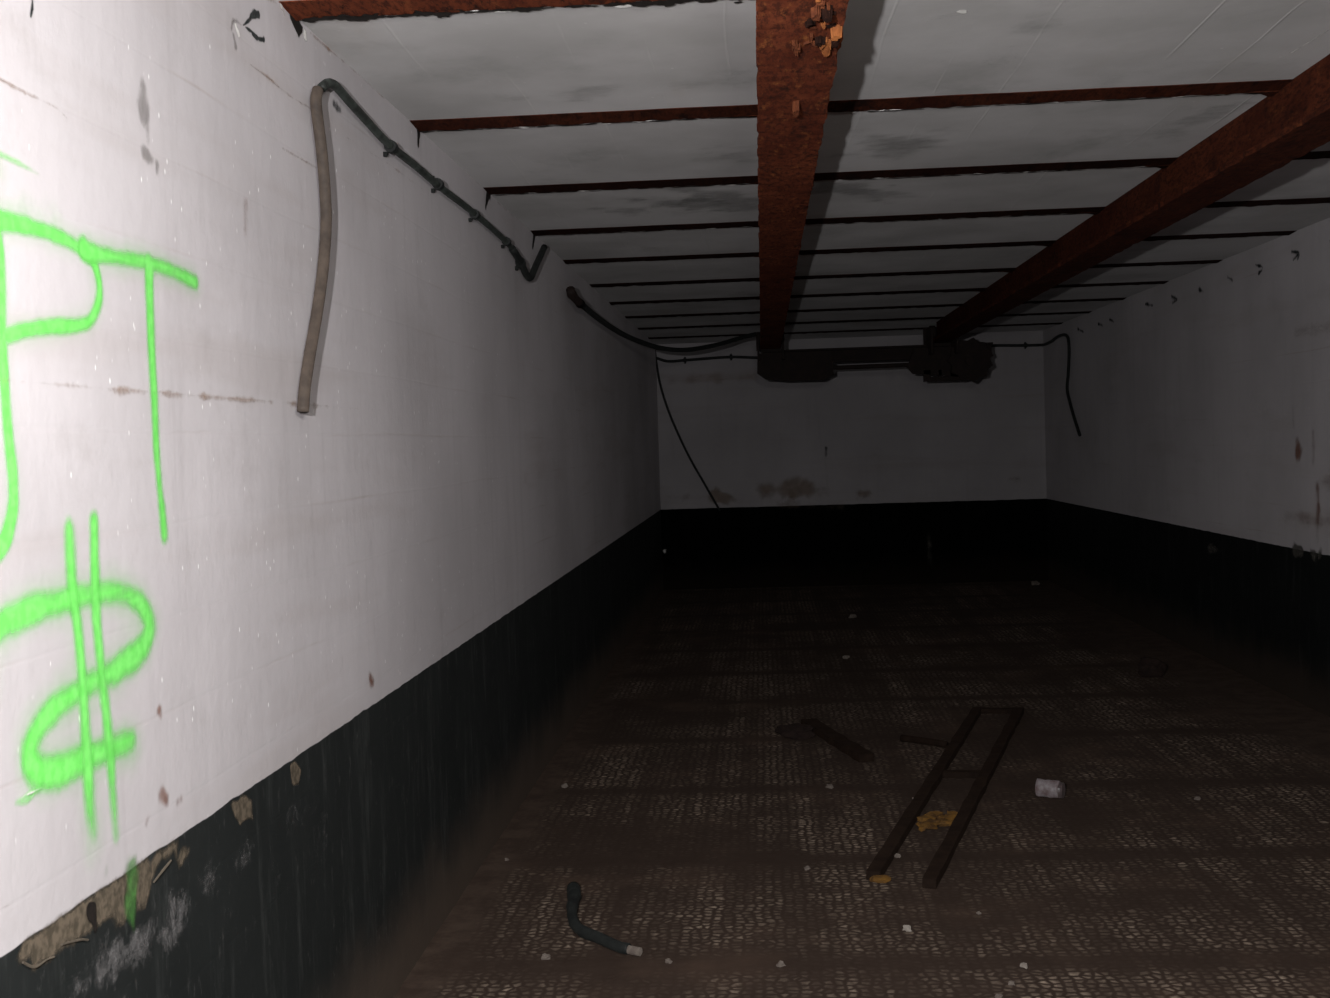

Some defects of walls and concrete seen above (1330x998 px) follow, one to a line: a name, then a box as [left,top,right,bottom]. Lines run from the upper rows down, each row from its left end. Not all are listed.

rust [792,0,842,57]
peeling [290,762,301,785]
peeling [231,796,253,825]
peeling [18,843,189,968]